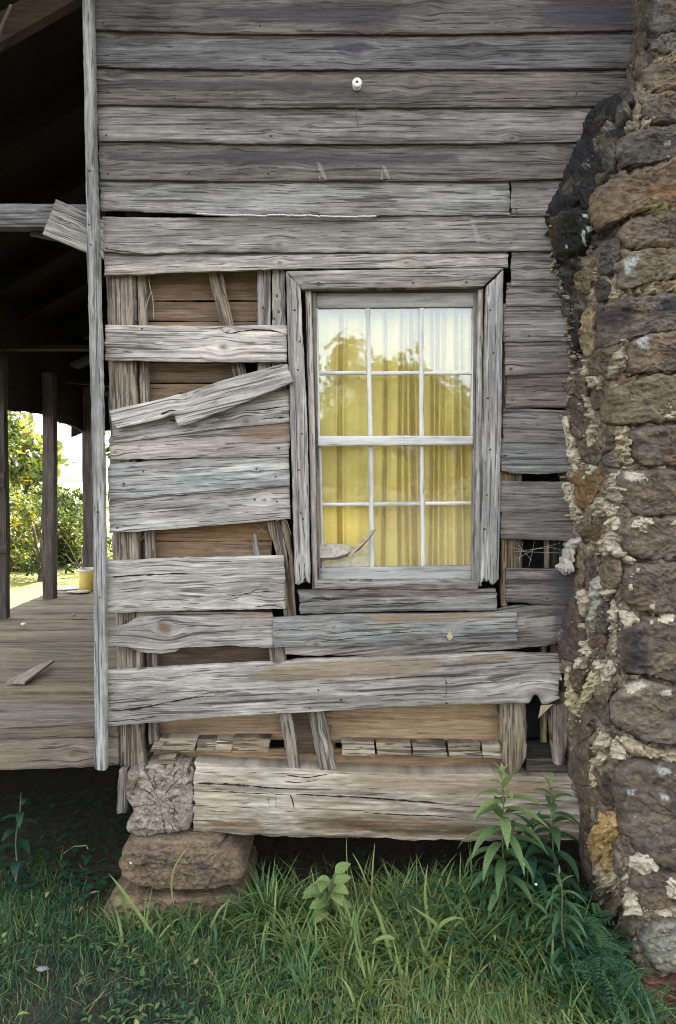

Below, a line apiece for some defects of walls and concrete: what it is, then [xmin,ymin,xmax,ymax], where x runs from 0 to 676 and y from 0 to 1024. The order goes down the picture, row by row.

crack [245,406,288,419]
crack [142,771,472,819]